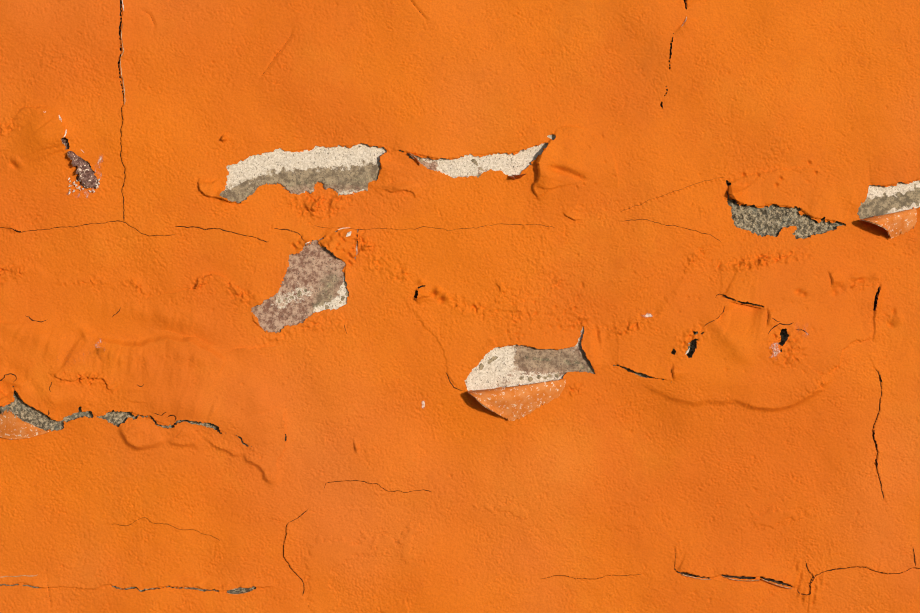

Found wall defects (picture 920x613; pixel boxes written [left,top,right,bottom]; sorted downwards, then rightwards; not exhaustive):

crack [660,0,692,108]
crack [0,0,558,246]
peeling [191,125,625,343]
peeling [723,158,920,245]
peeling [446,322,603,425]
crack [863,278,889,506]
crack [321,478,436,496]
crack [0,511,308,600]
crack [536,572,646,583]
crack [669,545,920,613]